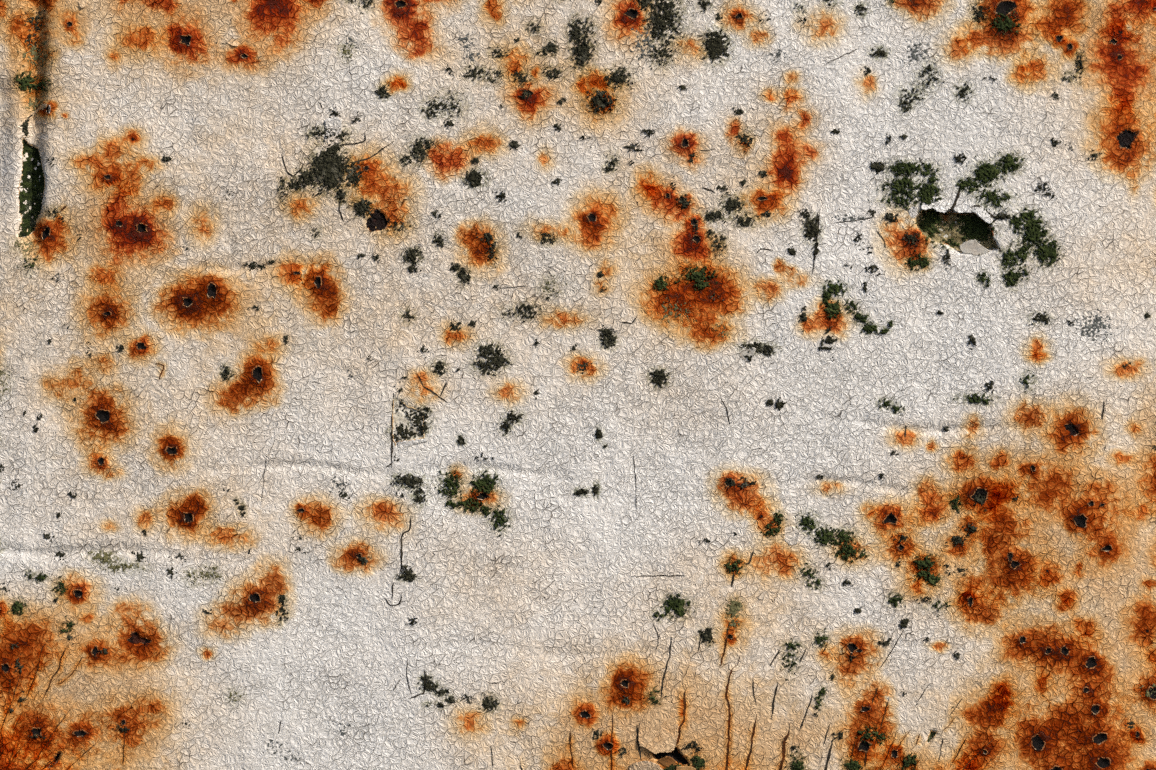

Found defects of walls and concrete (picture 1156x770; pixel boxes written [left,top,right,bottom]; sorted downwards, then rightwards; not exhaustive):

corrosion [1094,0,1156,175]
peeling [18,138,45,238]
corrosion [78,133,173,256]
peeling [908,196,998,255]
crack [936,182,1001,252]
corrosion [158,274,236,327]
crack [385,518,411,606]
corrosion [948,452,1120,624]
crack [0,639,125,770]
peeling [629,709,696,770]
crack [653,623,993,770]
corrosion [1004,620,1145,770]